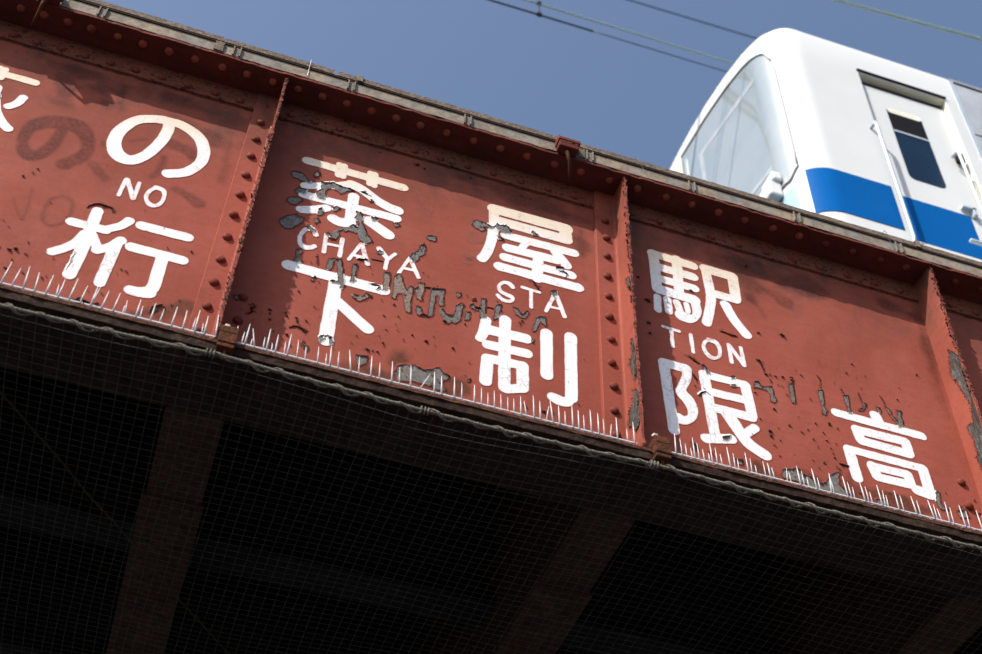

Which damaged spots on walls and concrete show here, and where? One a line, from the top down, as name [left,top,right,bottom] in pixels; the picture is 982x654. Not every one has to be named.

peeling [279,170,384,255]
peeling [293,248,303,263]
peeling [408,234,437,263]
peeling [310,257,547,366]
peeling [393,363,450,391]
peeling [627,338,640,431]
peeling [753,359,802,410]
peeling [842,387,905,428]
peeling [928,266,982,470]
peeling [768,388,861,496]
peeling [934,489,981,519]